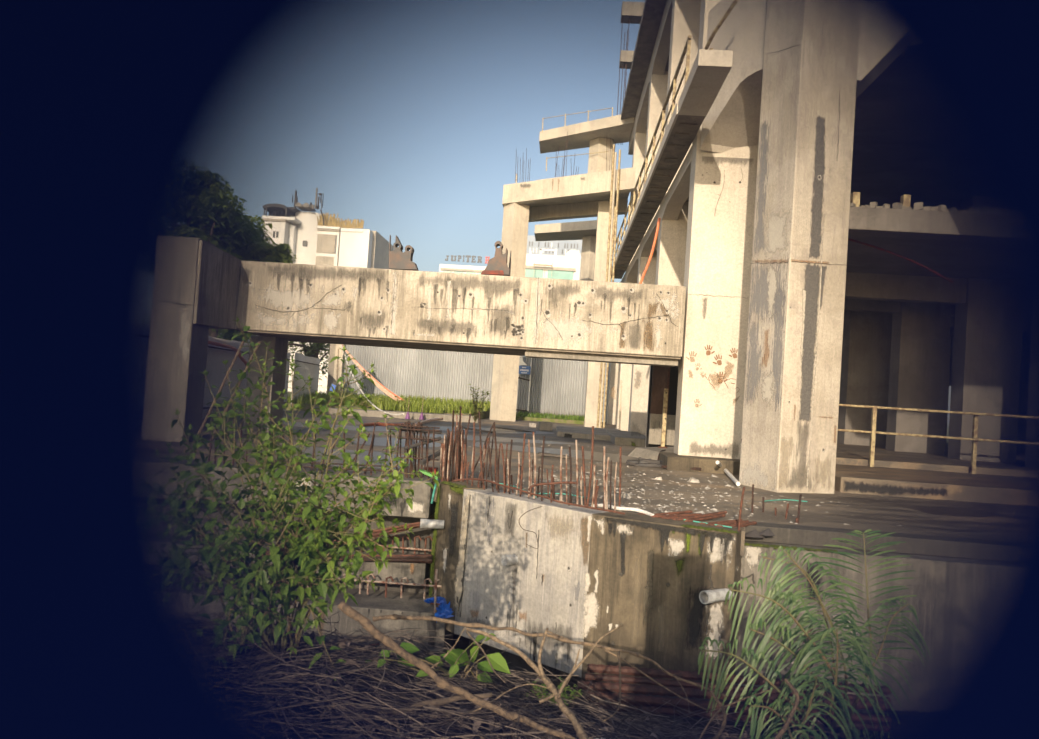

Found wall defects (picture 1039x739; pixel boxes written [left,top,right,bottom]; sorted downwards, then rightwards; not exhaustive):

peeling [765,212,791,318]
water stain [472,278,615,346]
water stain [655,293,678,351]
water stain [799,136,827,486]
peeling [761,372,775,406]
spalling [270,423,402,486]
spalling [354,406,631,615]
water stain [581,518,590,564]
water stain [605,518,733,624]
peeling [639,463,802,563]
peeling [746,547,760,567]
water stain [686,587,723,657]